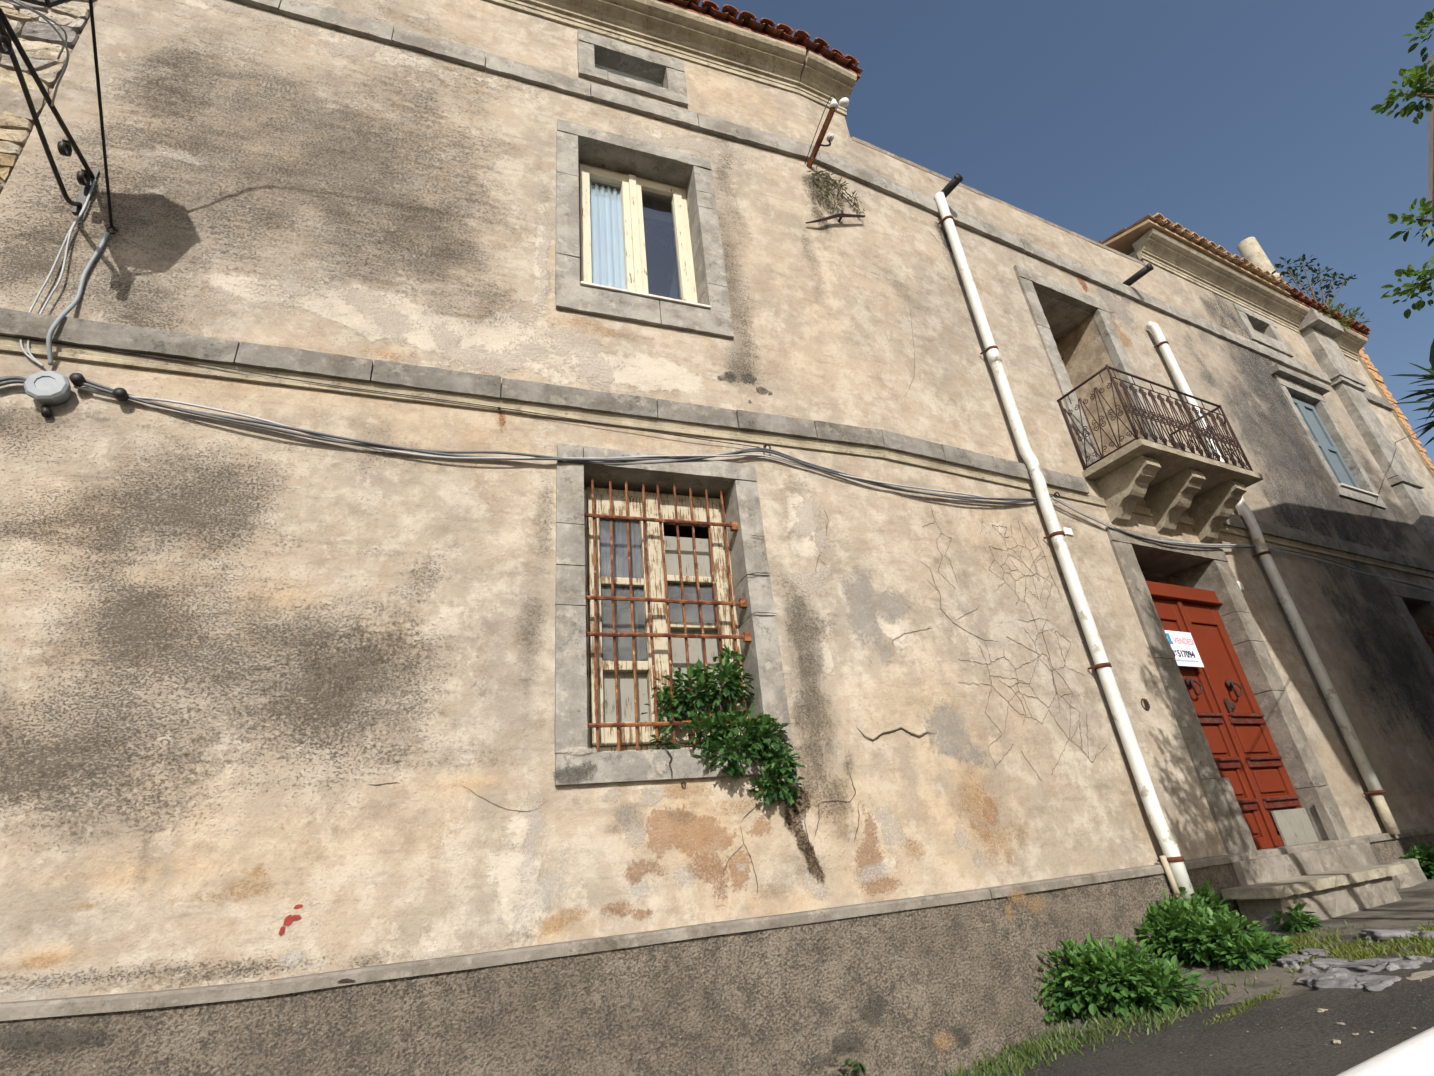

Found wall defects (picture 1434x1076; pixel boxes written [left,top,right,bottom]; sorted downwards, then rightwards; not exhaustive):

leakage [1204,301,1406,547]
spalling [562,747,597,755]
peeling [601,760,772,920]
leakage [784,602,831,882]
peeling [855,797,919,896]
crack [892,508,1106,781]